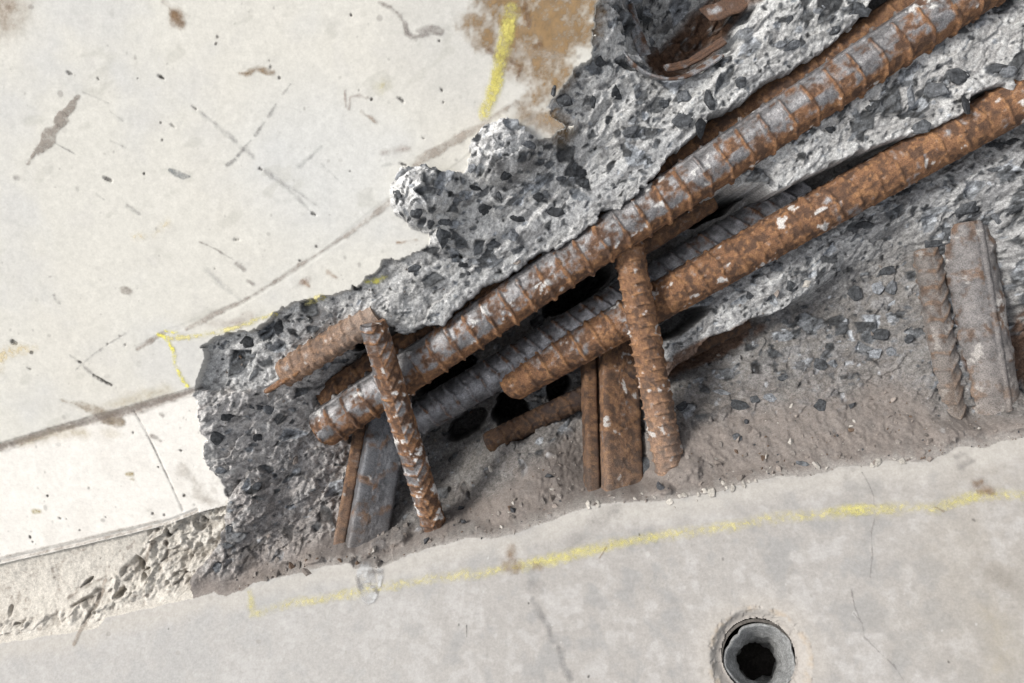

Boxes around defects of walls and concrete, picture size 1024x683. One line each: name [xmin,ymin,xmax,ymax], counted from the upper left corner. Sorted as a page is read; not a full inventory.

corrosion [464,0,600,137]
spalling [190,0,1024,598]